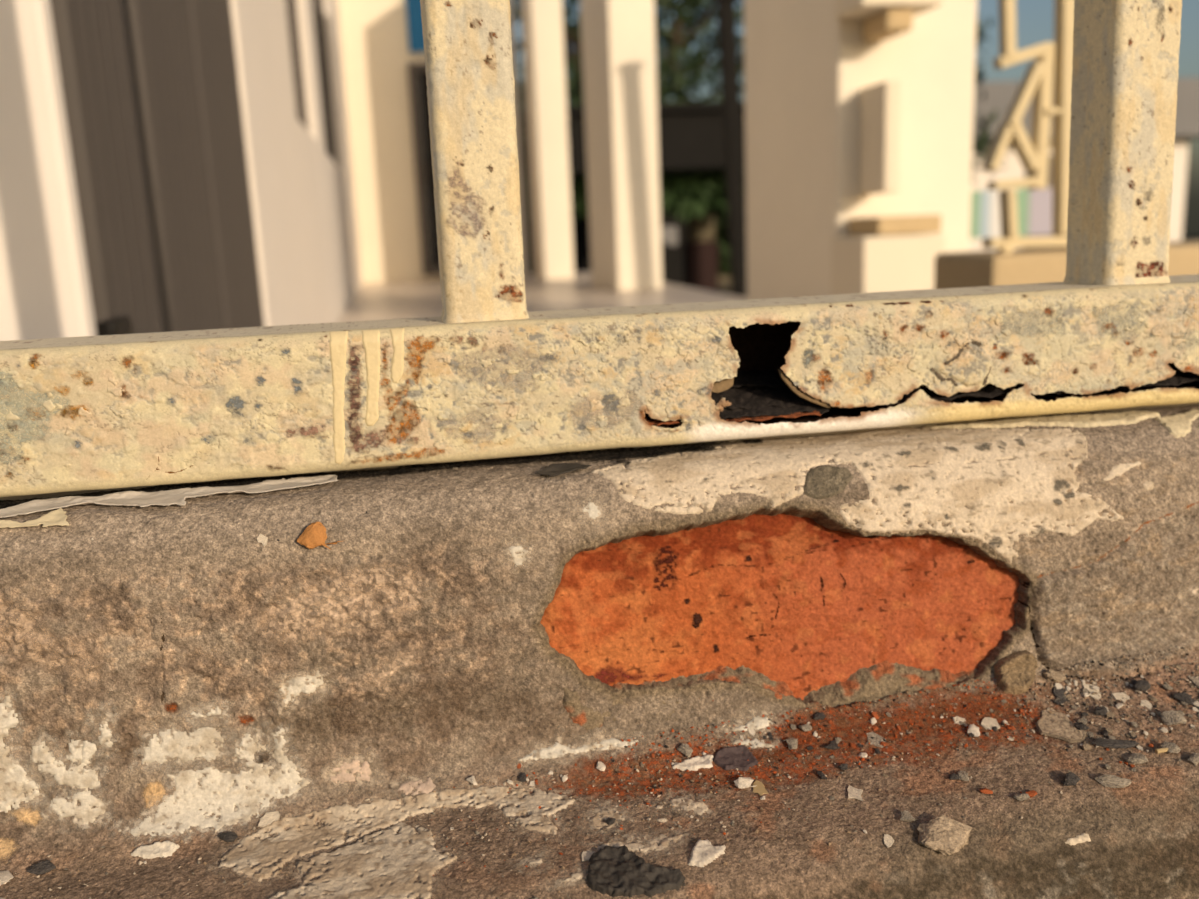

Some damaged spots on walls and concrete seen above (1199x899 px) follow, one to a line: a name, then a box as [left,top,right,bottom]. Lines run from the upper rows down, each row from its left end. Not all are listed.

rust [1136,262,1166,278]
rust [286,425,323,437]
rust [347,336,484,462]
rust [818,357,833,389]
spalling [0,408,1199,899]
crack [1017,502,1198,681]